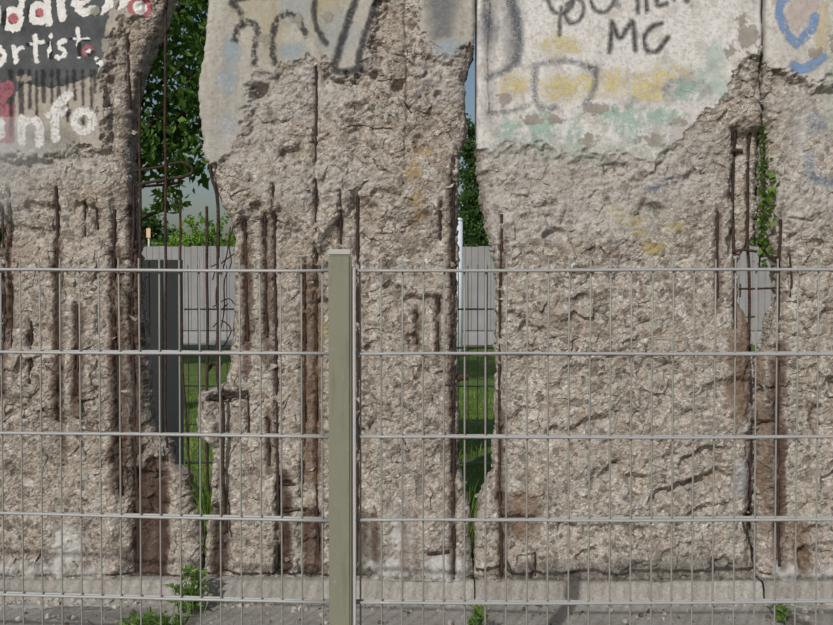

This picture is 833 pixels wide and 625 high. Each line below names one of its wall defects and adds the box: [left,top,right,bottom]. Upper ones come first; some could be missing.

rust [1,229,11,394]
rust [52,343,63,417]
rust [71,306,80,416]
spalling [0,0,200,581]
rust [111,205,168,577]
spalling [165,0,833,582]
rust [278,472,290,571]
rust [304,508,320,577]